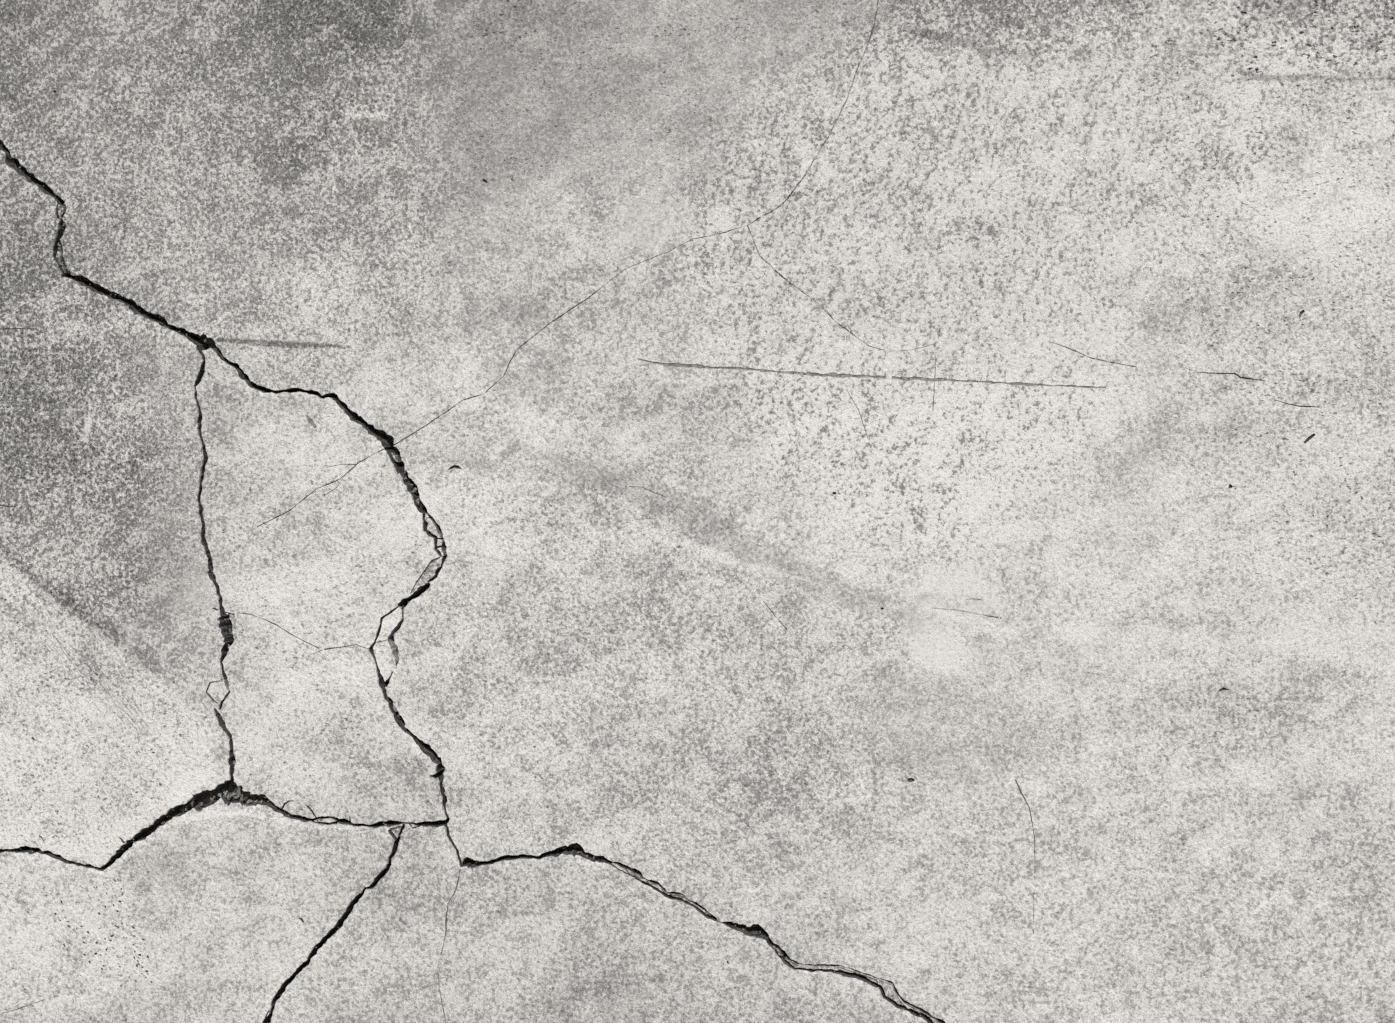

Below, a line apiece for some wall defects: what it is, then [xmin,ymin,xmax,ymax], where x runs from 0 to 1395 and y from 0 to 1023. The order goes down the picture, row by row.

crack [0,0,1106,1023]
crack [1052,342,1136,367]